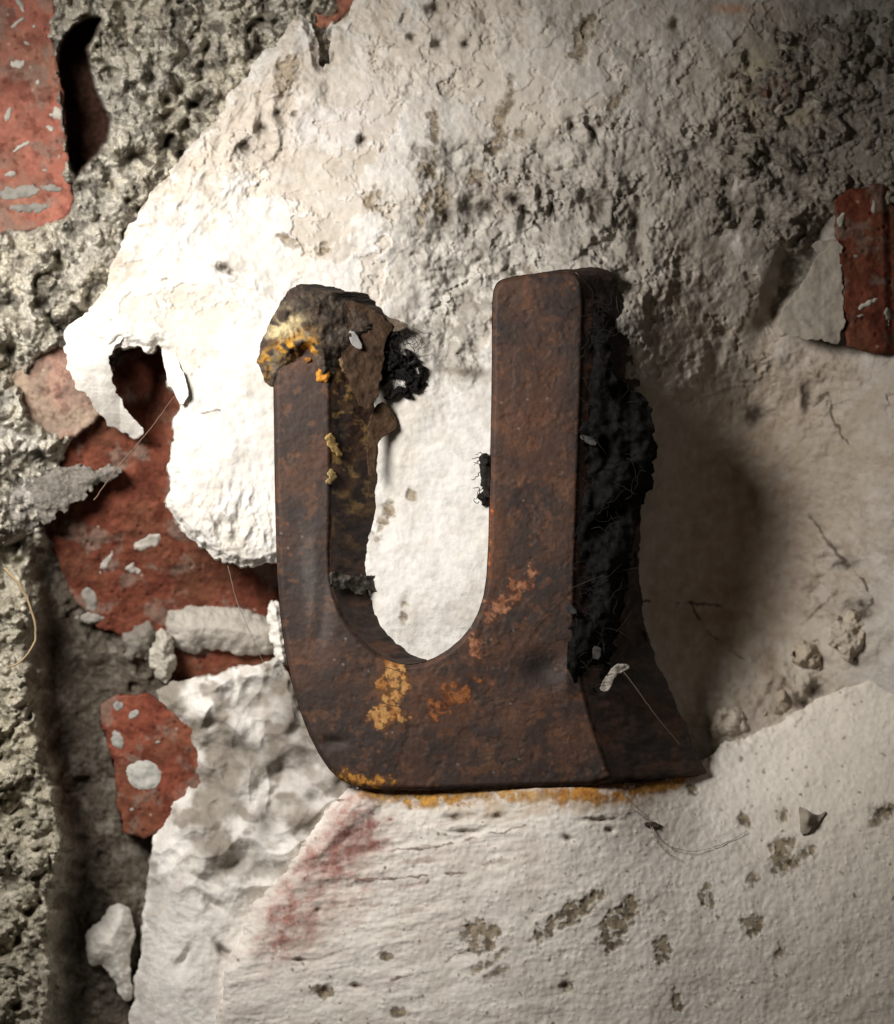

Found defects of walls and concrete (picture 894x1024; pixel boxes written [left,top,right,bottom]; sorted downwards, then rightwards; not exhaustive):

spalling [0,0,74,233]
spalling [778,183,894,354]
spalling [12,313,279,642]
corrosion [483,565,537,623]
spalling [171,645,289,682]
corrosion [367,660,412,730]
corrosion [427,678,482,722]
corrosion [469,633,481,659]
spalling [100,692,201,839]
corrosion [332,769,687,809]